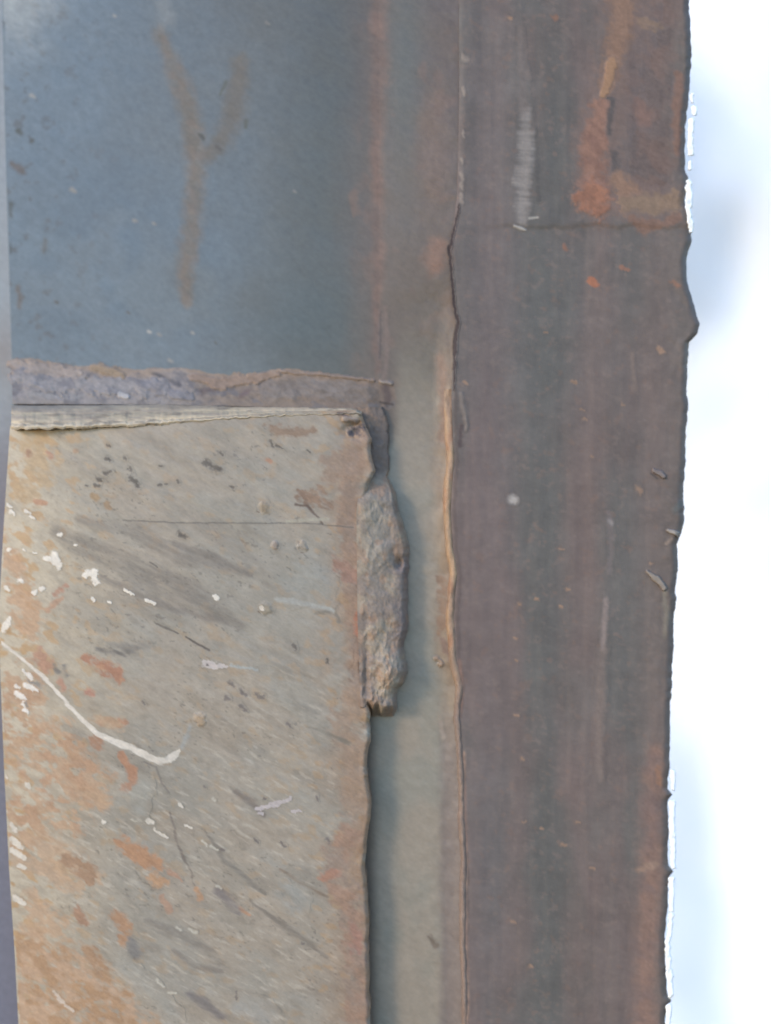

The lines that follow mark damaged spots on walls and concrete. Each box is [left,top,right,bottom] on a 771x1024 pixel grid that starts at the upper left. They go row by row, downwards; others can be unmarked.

corrosion [561,0,691,240]
crack [446,203,466,719]